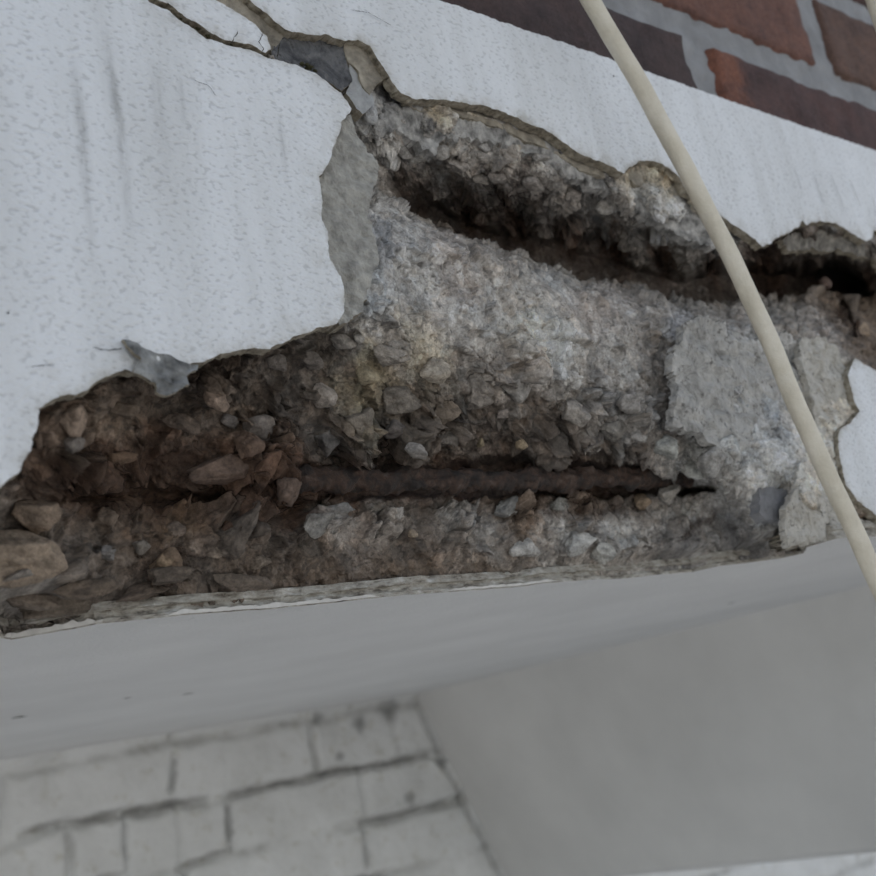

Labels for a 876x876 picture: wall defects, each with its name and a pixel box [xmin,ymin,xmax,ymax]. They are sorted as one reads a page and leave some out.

crack [299,62,318,73]
spalling [0,0,840,638]
spalling [729,224,876,471]
spalling [852,503,873,523]